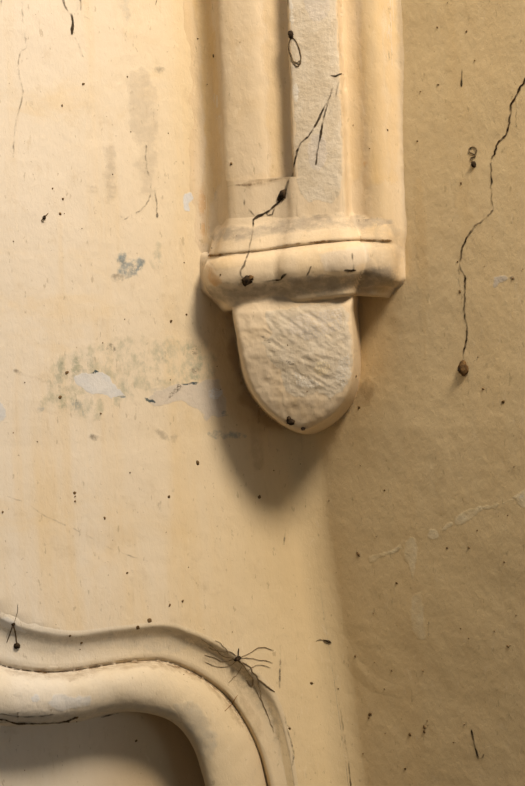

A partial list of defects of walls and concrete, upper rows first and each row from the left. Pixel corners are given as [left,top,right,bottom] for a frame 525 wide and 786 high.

crack [63,0,81,35]
crack [251,107,327,225]
crack [490,78,525,184]
crack [460,211,492,352]
peeling [74,370,126,398]
peeling [145,378,228,421]